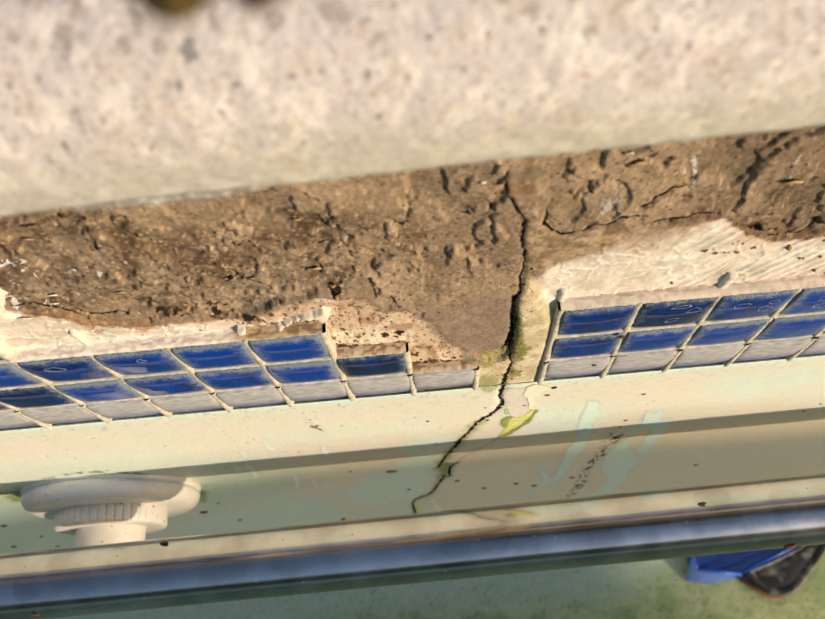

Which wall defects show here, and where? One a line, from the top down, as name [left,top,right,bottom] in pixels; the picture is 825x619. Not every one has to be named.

crack [5,297,160,315]
spalling [0,125,825,364]
crack [411,171,717,513]
crack [748,218,825,236]